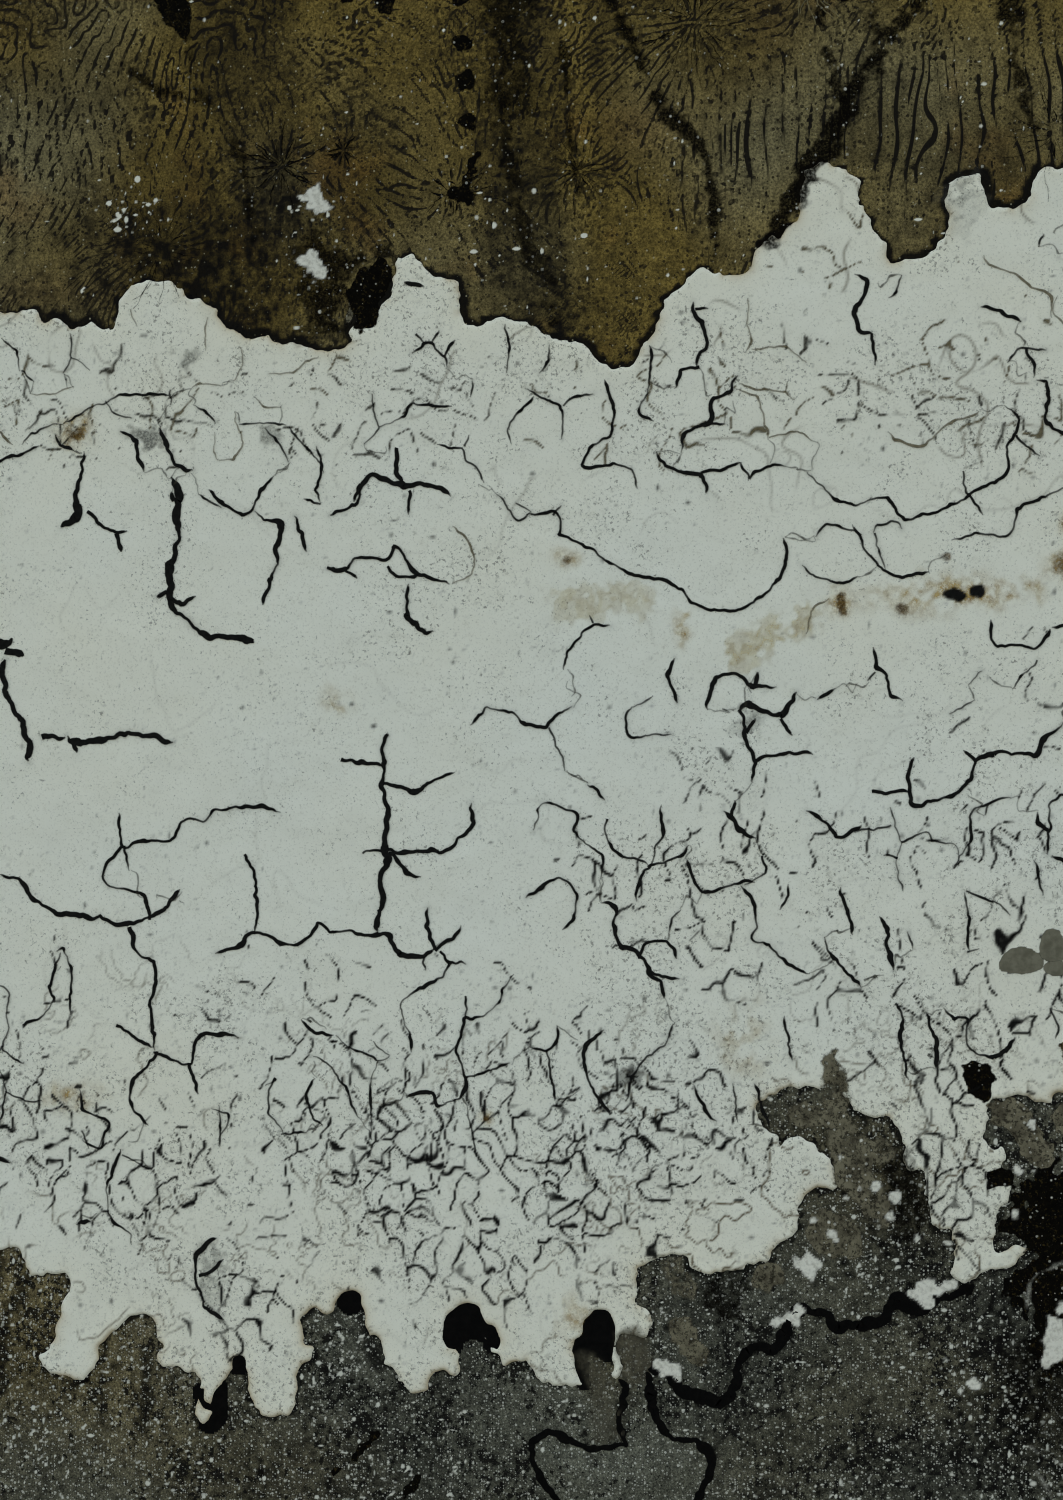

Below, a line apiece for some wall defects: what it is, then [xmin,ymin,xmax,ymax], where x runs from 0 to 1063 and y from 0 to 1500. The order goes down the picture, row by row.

damp [154,0,192,60]
damp [299,231,392,334]
damp [373,0,395,15]
damp [447,0,556,283]
peeling [0,0,1063,369]
crack [0,67,1063,644]
damp [605,0,722,257]
damp [758,0,925,249]
damp [996,0,1040,130]
crack [0,615,1063,1437]
peeling [0,1048,1063,1500]
damp [987,1156,1063,1379]